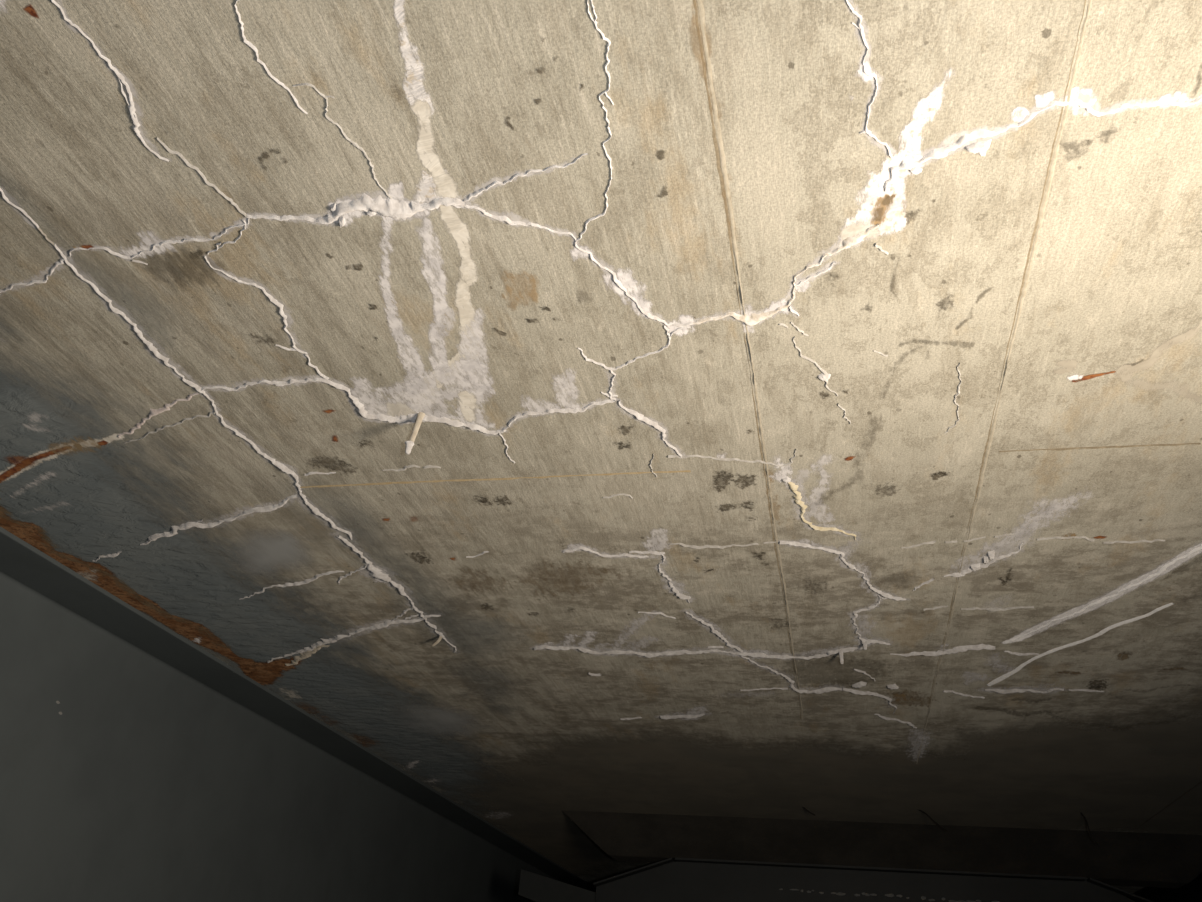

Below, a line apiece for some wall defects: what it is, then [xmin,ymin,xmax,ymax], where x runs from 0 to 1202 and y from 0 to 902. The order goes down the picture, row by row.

leakage [351,0,495,428]
rust [0,392,199,483]
crack [0,0,1202,666]
rust [1067,371,1115,382]
rust [0,507,256,676]
crack [534,528,917,728]
crack [943,688,1104,699]